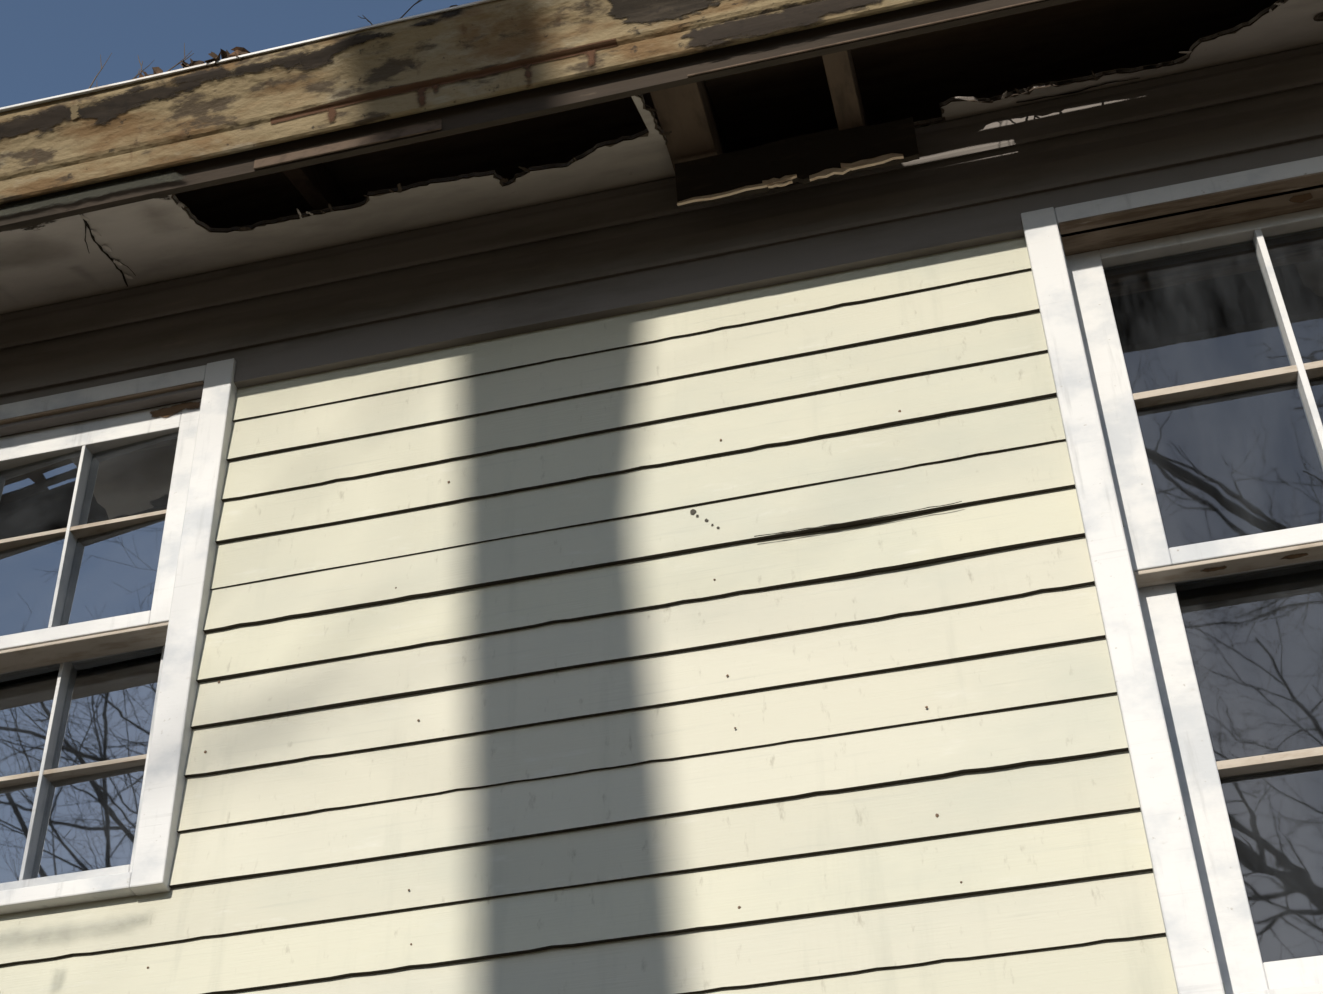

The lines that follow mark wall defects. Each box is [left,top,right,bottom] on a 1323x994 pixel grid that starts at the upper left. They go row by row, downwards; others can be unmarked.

leakage [0,169,184,216]
crack [80,214,136,287]